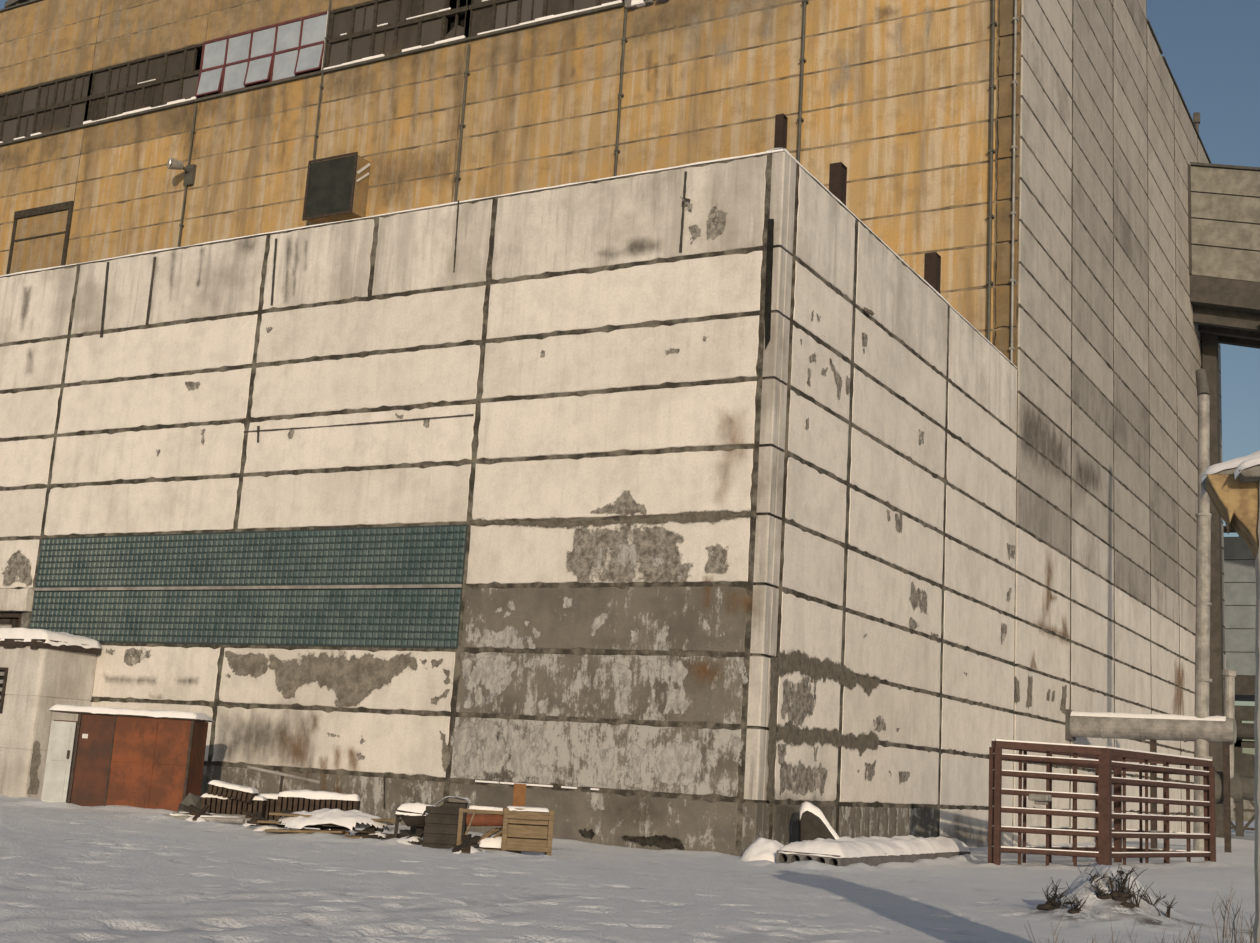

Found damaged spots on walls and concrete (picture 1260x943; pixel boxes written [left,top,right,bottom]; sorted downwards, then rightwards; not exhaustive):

peeling [680,197,727,244]
peeling [800,339,850,399]
peeling [566,491,729,590]
peeling [2,550,32,586]
peeling [495,600,516,618]
peeling [909,582,940,638]
spalling [225,650,450,707]
peeling [646,661,689,715]
peeling [735,657,748,684]
peeling [781,677,817,726]
peeling [440,724,485,779]
peeling [778,743,827,796]